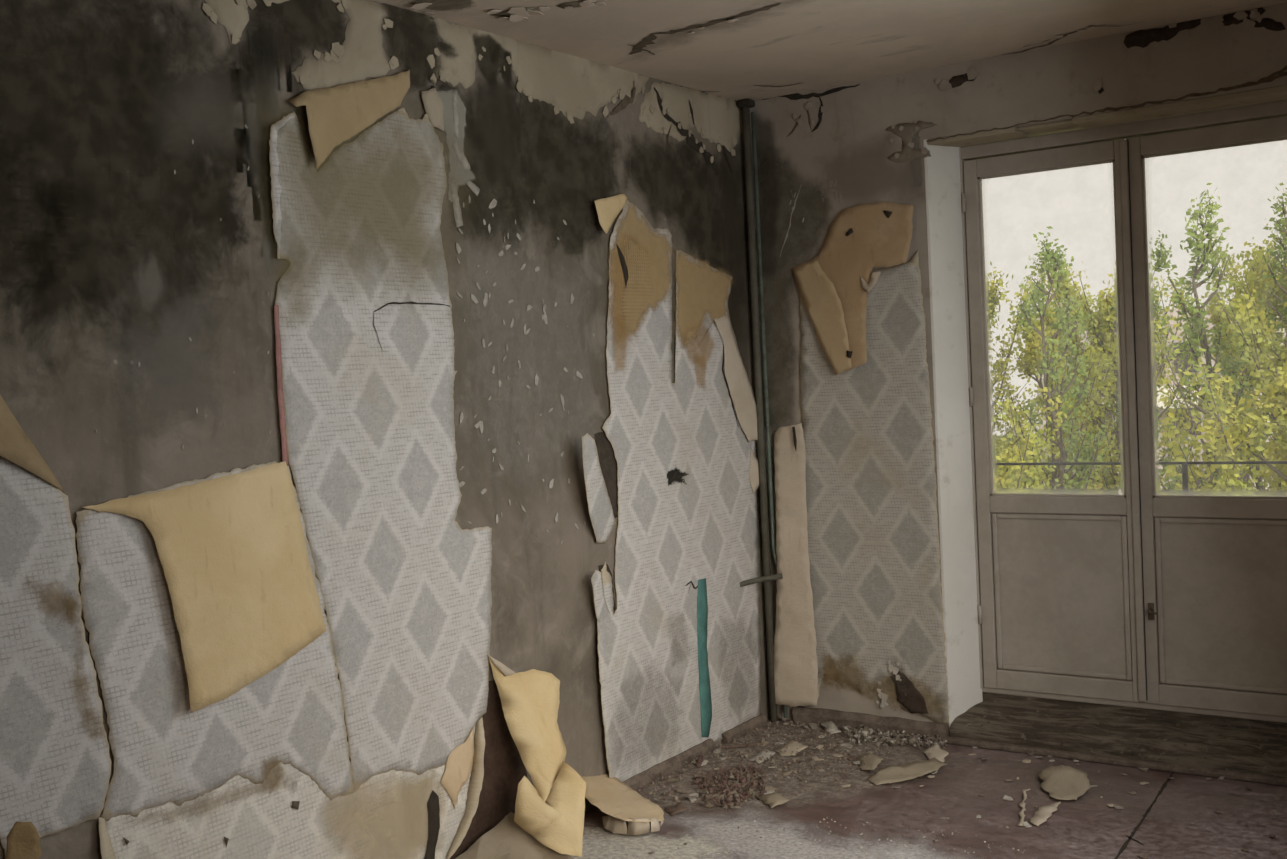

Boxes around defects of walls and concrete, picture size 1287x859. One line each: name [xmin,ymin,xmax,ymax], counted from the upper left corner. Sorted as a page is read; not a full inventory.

damp [0,0,345,326]
peeling [202,0,288,44]
damp [385,3,454,87]
peeling [289,0,743,169]
crack [606,87,732,175]
crack [630,3,781,55]
crack [754,83,860,137]
spalling [1118,7,1285,49]
damp [446,35,827,429]
peeling [792,202,914,375]
damp [460,412,504,470]
peeling [82,461,326,713]